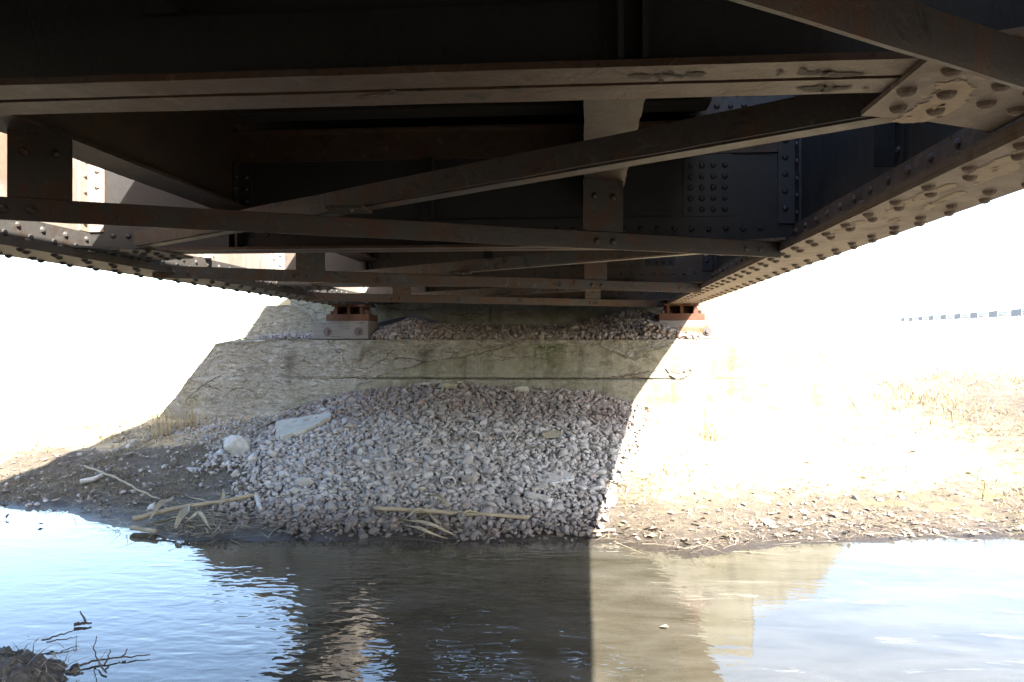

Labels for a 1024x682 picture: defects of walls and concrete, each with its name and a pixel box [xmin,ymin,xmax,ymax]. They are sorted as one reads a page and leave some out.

crack [293,300,669,380]